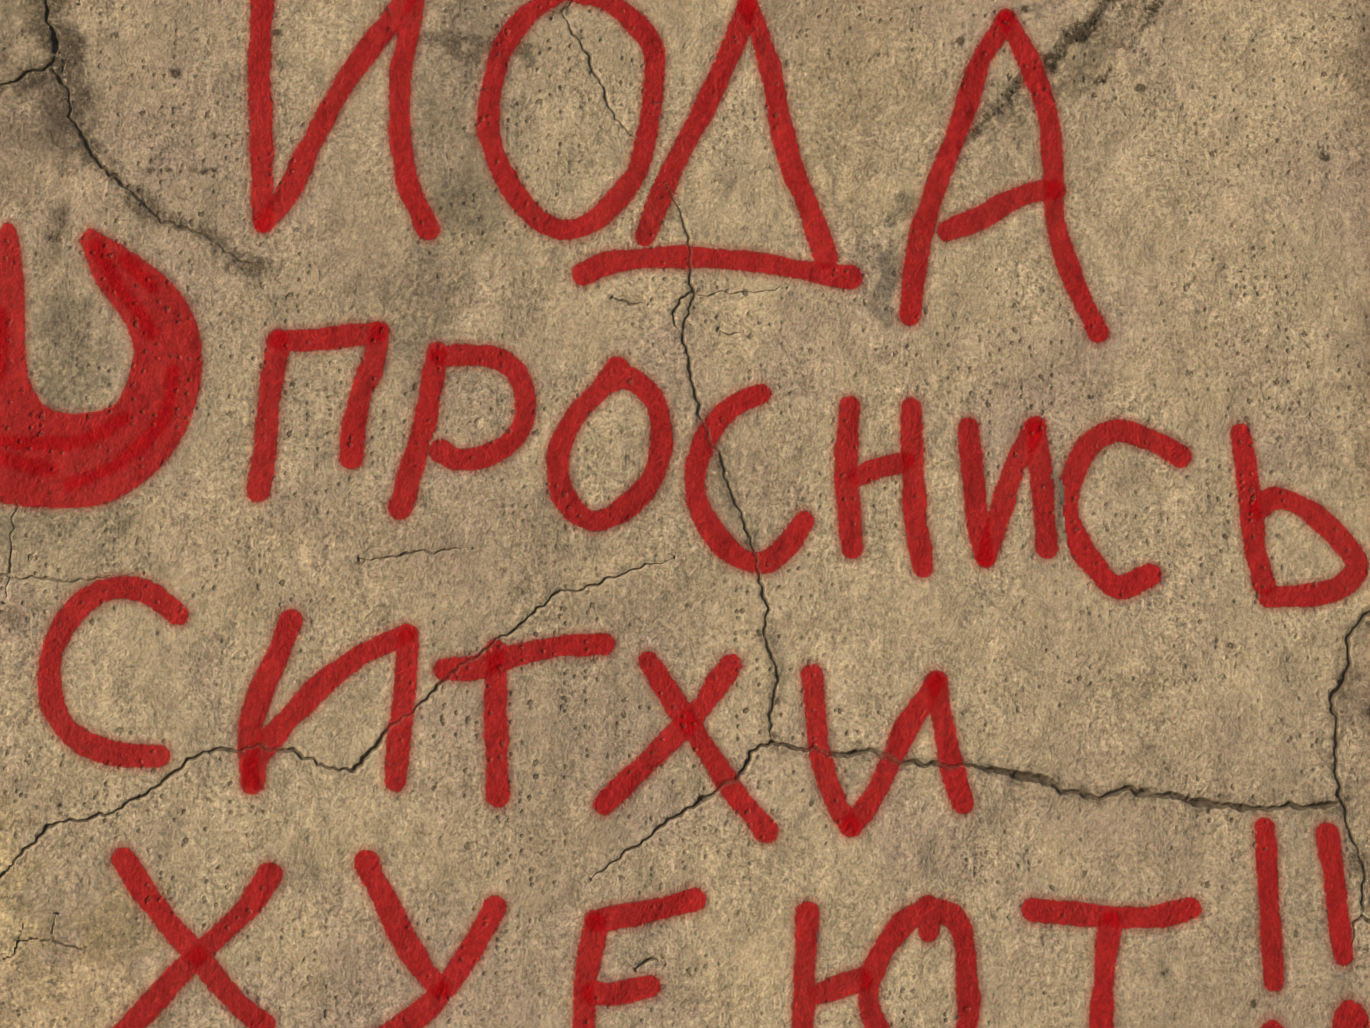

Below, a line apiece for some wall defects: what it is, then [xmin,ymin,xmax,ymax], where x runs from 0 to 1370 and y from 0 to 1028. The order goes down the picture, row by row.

crack [0,0,270,275]
crack [549,0,636,142]
crack [0,504,143,604]
crack [359,543,472,566]
crack [588,186,1370,951]
crack [0,554,675,883]
crack [2,913,103,962]
crack [632,953,665,973]